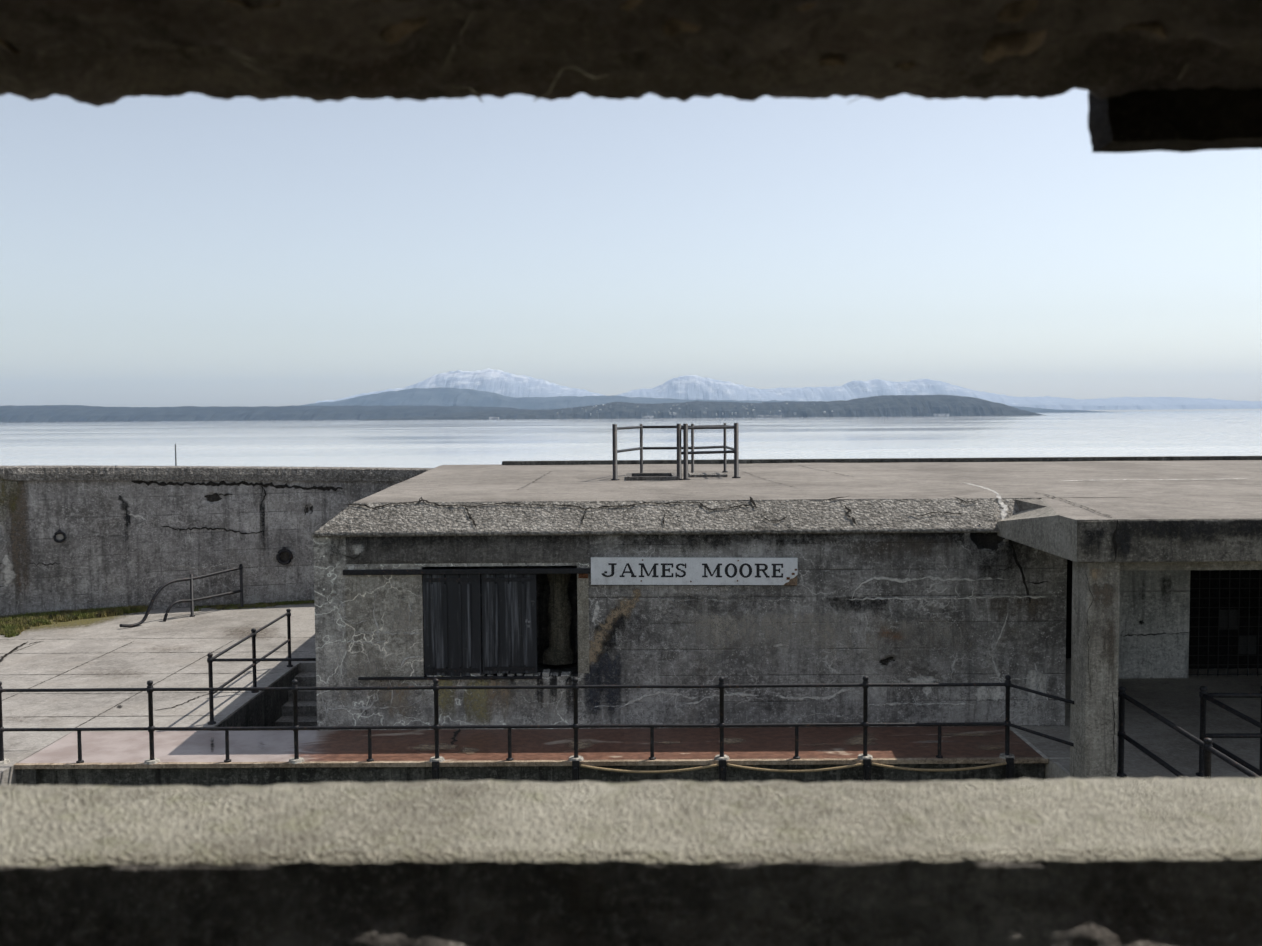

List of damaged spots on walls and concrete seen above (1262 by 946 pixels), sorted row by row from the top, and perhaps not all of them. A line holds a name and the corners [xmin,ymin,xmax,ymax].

leakage [0,478,30,589]
crack [115,465,856,568]
crack [911,483,978,516]
crack [997,539,1047,602]
leakage [537,600,757,715]